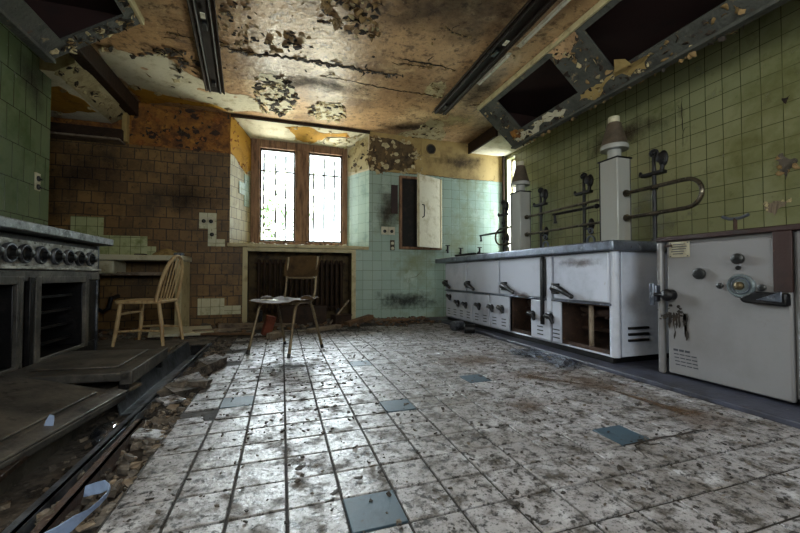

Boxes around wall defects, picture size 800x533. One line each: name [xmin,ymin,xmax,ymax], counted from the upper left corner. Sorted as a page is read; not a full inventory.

peeling [217,0,383,54]
crack [219,41,455,98]
peeling [548,31,697,110]
peeling [50,1,300,208]
flaking render [285,88,456,175]
peeling [484,105,578,146]
water stain [387,295,430,308]
spalling [174,372,205,382]
spalling [155,394,186,406]
spalling [131,428,165,442]
spalling [174,416,204,426]